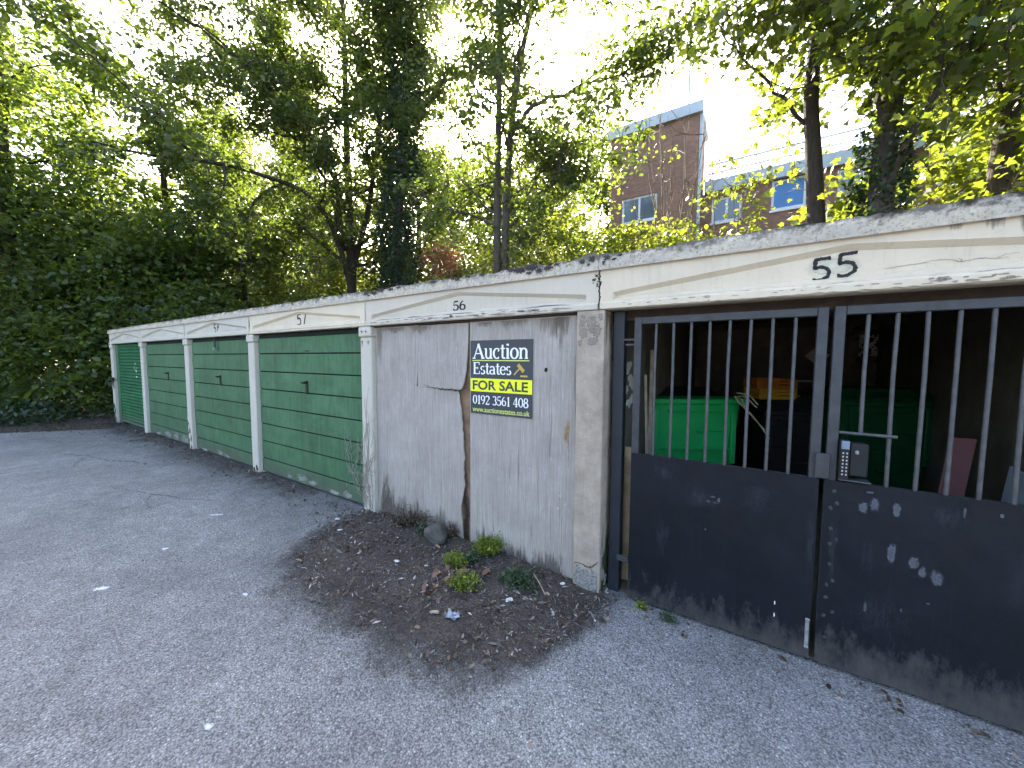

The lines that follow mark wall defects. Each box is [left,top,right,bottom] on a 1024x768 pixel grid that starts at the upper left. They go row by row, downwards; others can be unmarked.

peeling [924,273,1021,284]